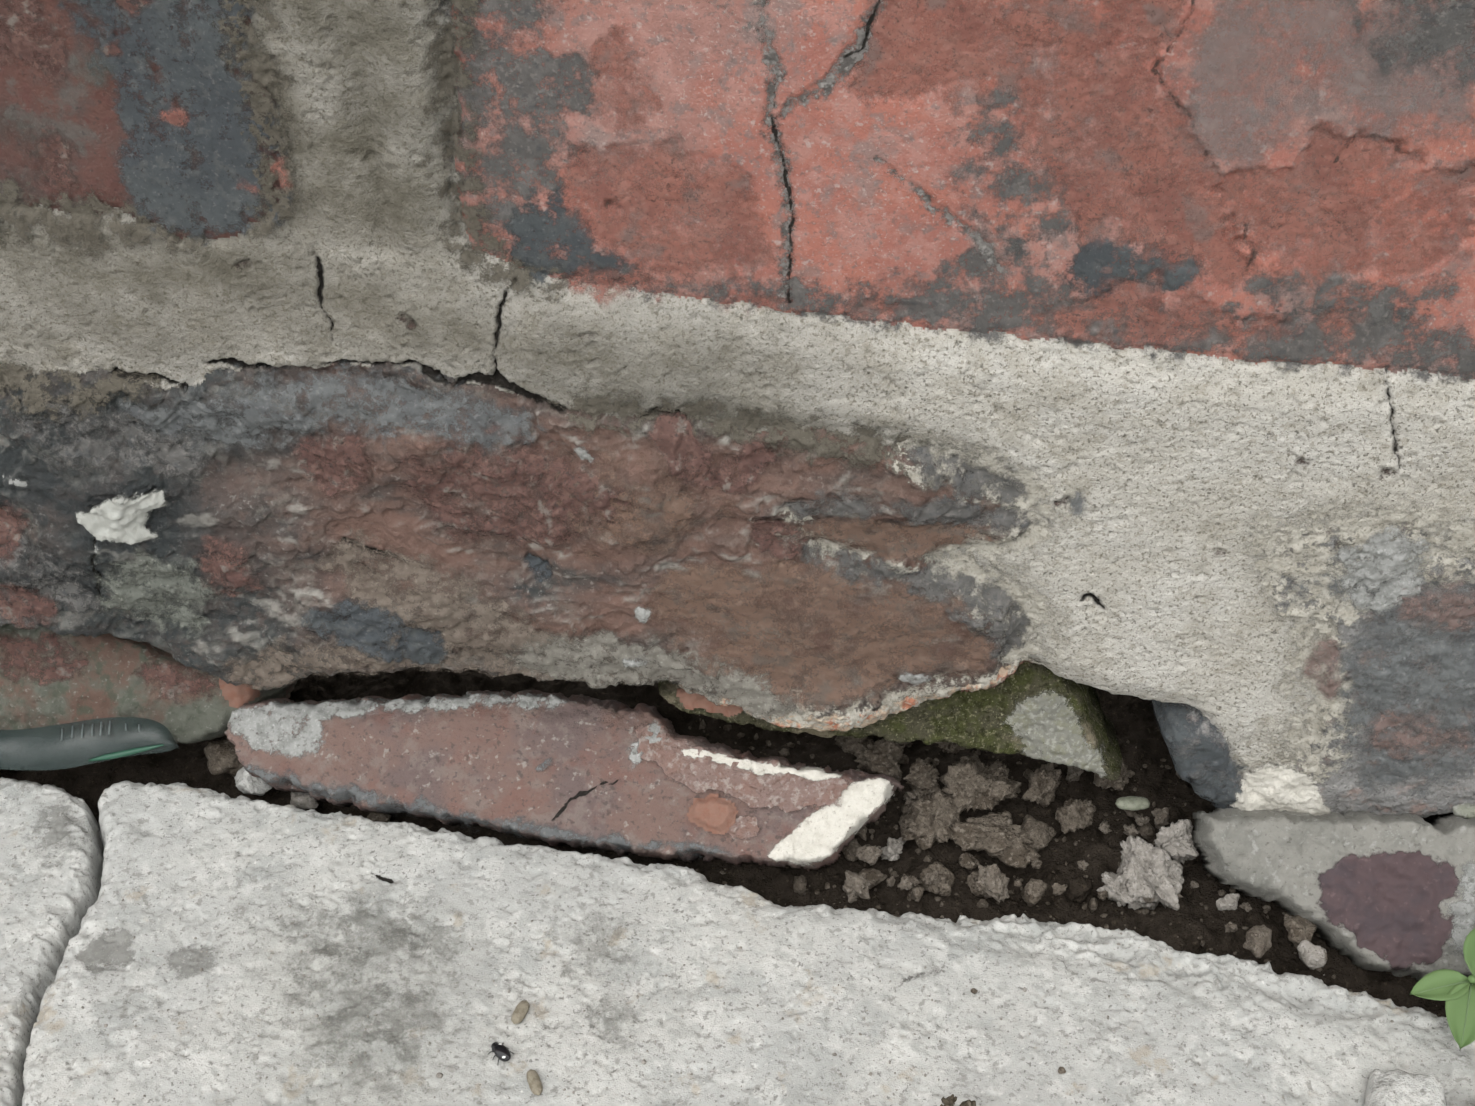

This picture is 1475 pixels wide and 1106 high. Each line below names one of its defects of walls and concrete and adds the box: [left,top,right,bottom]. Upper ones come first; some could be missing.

crack [1151,0,1214,163]
crack [717,0,887,311]
crack [1243,223,1256,271]
crack [114,357,272,393]
crack [316,256,566,412]
spalling [648,410,776,494]
peeling [76,490,167,545]
spalling [396,426,636,583]
spalling [676,658,1030,731]